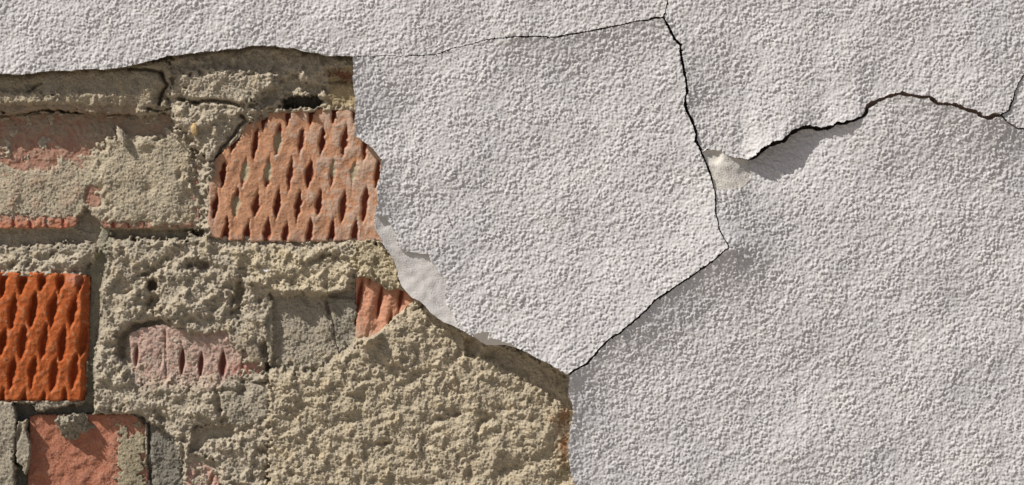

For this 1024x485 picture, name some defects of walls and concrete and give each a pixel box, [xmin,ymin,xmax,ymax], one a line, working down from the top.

spalling [0,45,575,485]
crack [353,0,729,375]
crack [748,73,1024,160]